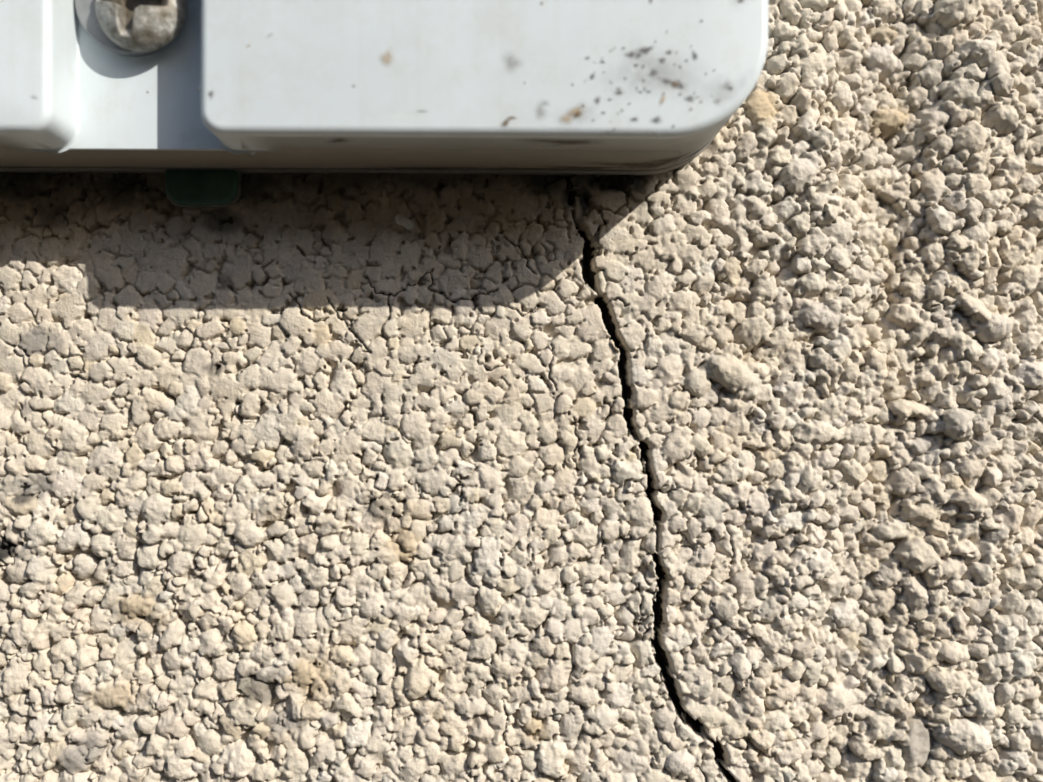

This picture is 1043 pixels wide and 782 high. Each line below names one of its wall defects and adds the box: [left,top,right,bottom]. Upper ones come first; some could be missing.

crack [565,178,678,525]
crack [726,527,735,570]
crack [638,553,749,782]
crack [735,664,753,699]